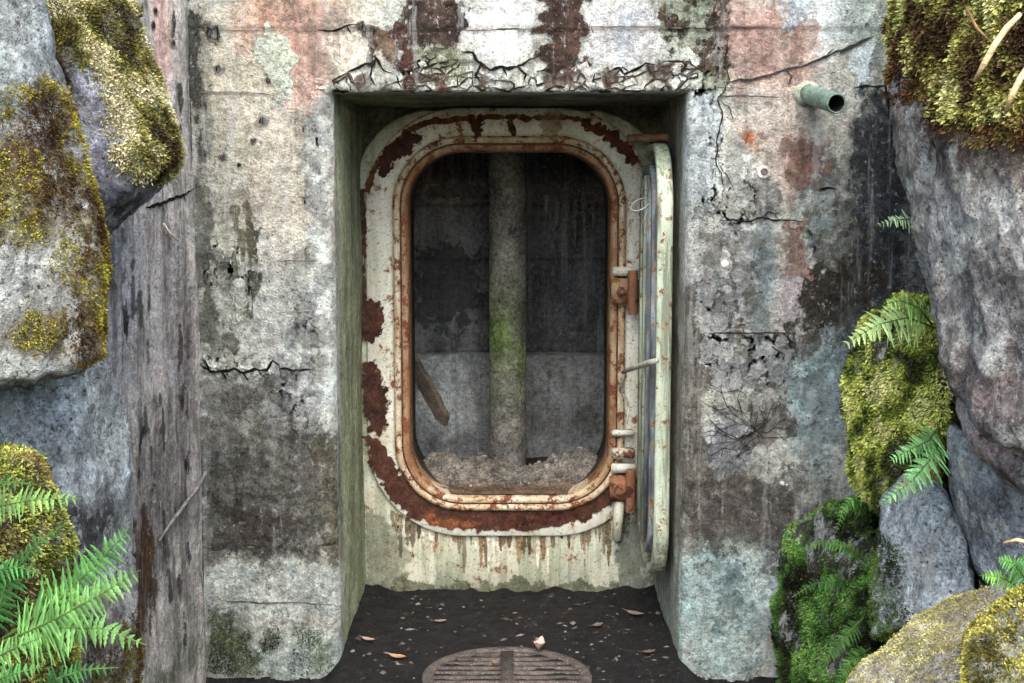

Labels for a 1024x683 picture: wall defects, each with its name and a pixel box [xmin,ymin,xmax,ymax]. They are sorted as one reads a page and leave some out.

crack [200,358,311,380]
corrosion [361,359,630,582]
corrosion [360,113,640,344]
crack [314,20,874,222]
peeling [696,168,796,391]
leakage [779,81,920,362]
crack [854,85,890,117]